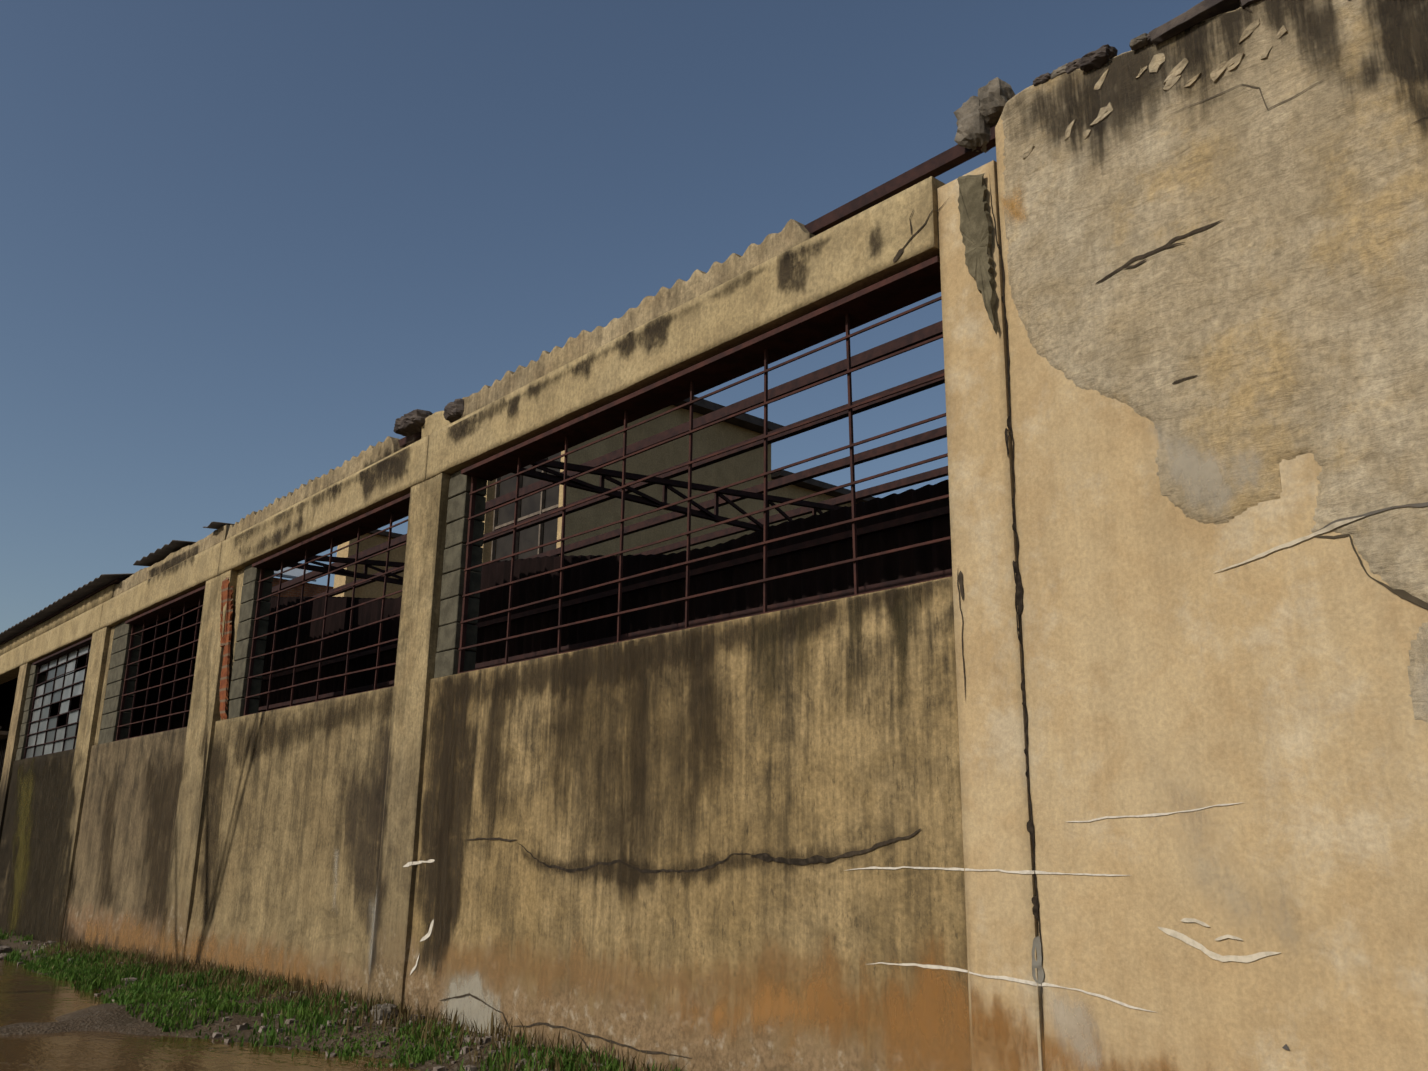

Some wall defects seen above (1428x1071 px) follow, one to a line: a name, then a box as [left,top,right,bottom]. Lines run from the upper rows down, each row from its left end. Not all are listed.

leakage [1031,0,1339,158]
leakage [1368,0,1428,131]
crack [1096,219,1223,284]
flaking render [957,0,1428,603]
leakage [360,440,413,498]
crack [989,176,1044,1038]
crack [1213,502,1428,610]
flaking render [1407,622,1428,722]
leakage [200,693,392,967]
leakage [419,579,945,972]
crack [467,829,920,873]
leakage [444,974,499,1034]